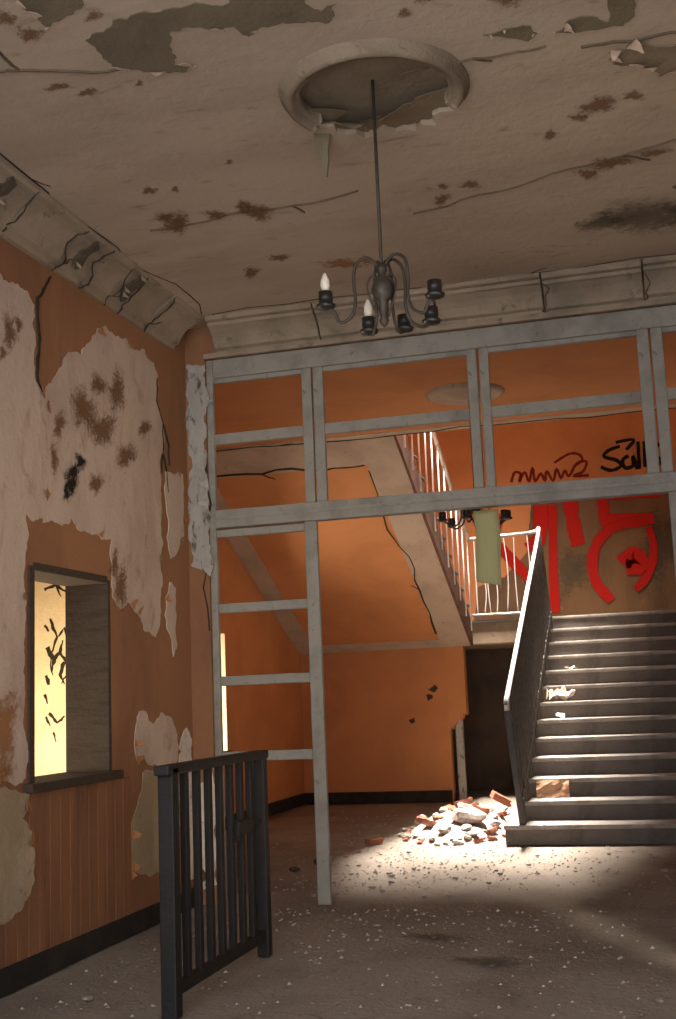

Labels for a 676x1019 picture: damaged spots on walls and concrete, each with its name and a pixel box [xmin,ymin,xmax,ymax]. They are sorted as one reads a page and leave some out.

crack [0,51,119,74]
peeling [85,0,336,77]
crack [459,45,546,63]
crack [581,31,676,49]
peeling [609,39,676,79]
crack [413,138,676,215]
crack [150,190,358,232]
damp [584,203,676,229]
spalling [326,411,641,443]
damp [64,453,86,499]
peeling [0,274,305,786]
peeling [131,710,217,889]